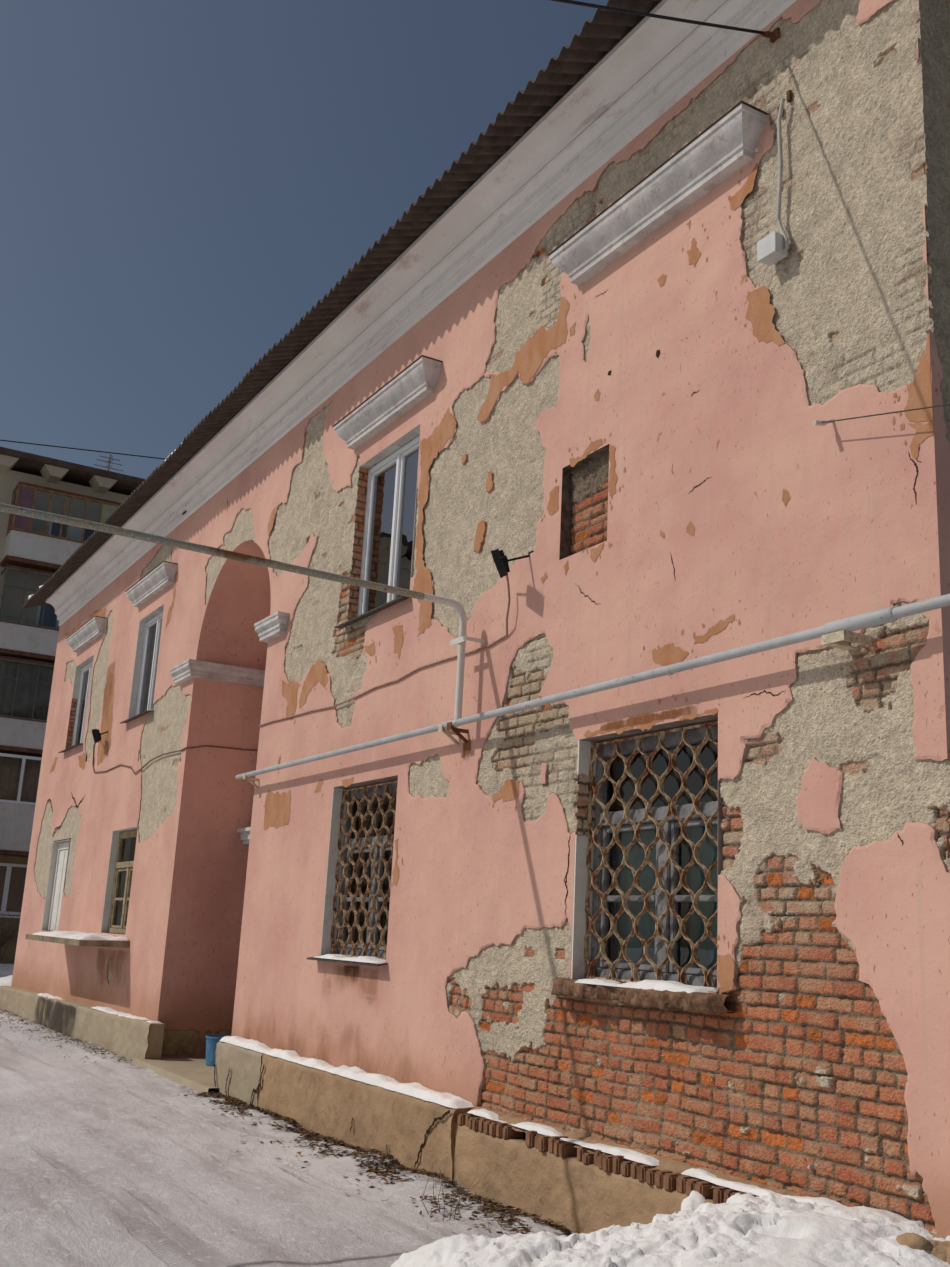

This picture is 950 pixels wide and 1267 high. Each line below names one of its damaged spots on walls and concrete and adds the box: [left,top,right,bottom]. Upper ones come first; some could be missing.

spalling [205,0,950,729]
crack [908,447,921,501]
spalling [137,685,192,843]
spalling [408,753,449,798]
spalling [34,799,81,899]
spalling [445,601,950,1239]
crack [214,1064,264,1105]
crack [386,1110,450,1167]